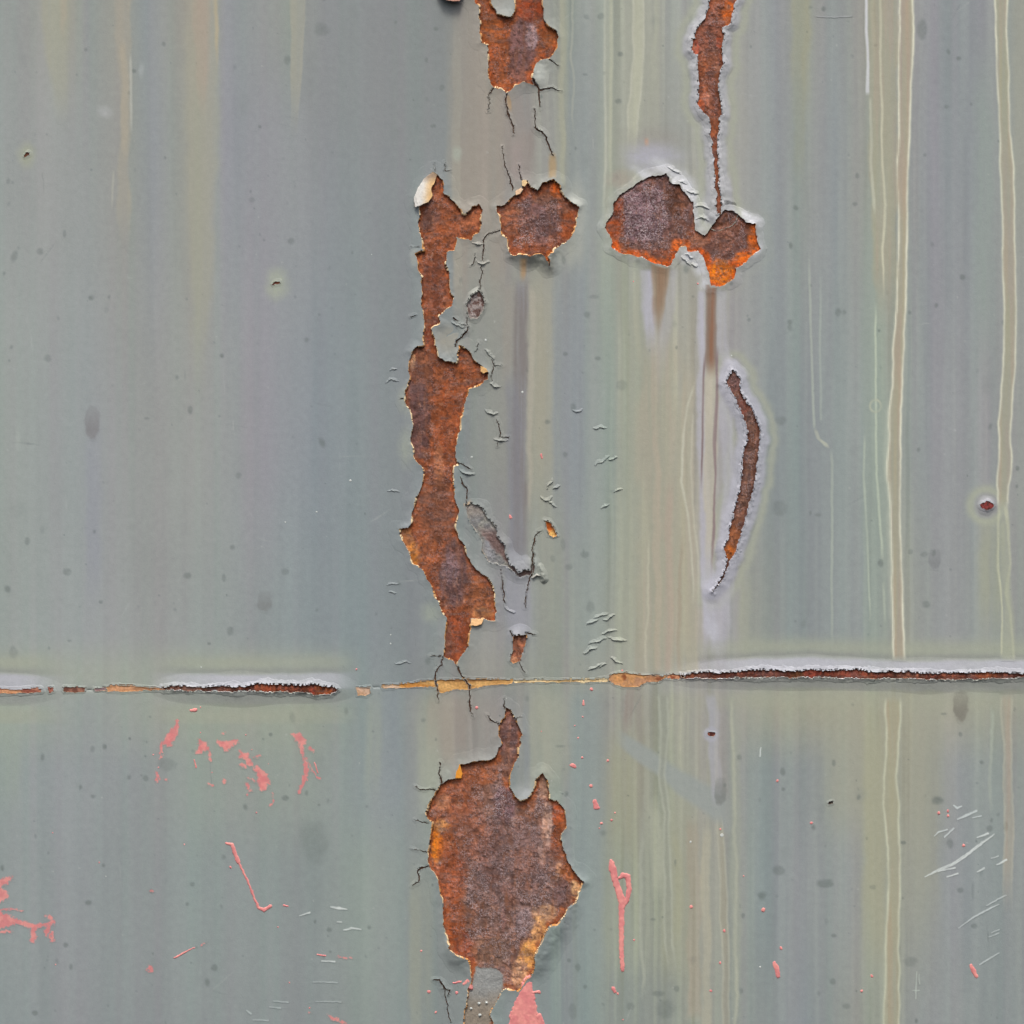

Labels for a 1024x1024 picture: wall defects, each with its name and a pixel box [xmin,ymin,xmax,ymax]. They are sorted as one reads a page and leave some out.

corrosion [462,0,569,113]
crack [485,59,564,192]
corrosion [387,151,768,677]
peeling [463,498,540,584]
crack [158,677,341,700]
crack [679,664,1024,685]
corrosion [415,697,596,1024]